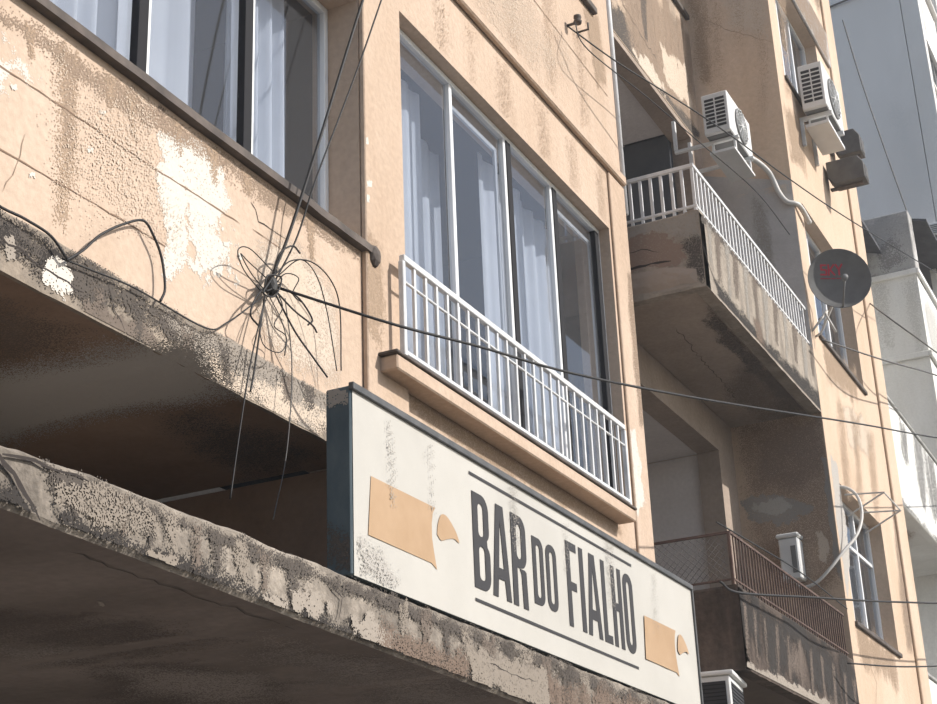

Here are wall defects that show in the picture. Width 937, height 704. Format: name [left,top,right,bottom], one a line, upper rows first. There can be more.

water stain [611,0,772,141]
water stain [777,0,831,179]
water stain [0,6,387,351]
peeling [154,131,242,292]
peeling [42,255,74,301]
water stain [279,372,316,411]
water stain [627,184,891,620]
peeling [54,480,181,566]
water stain [899,417,937,541]
spalling [262,583,335,621]
spalling [351,610,391,647]
water stain [739,587,899,704]